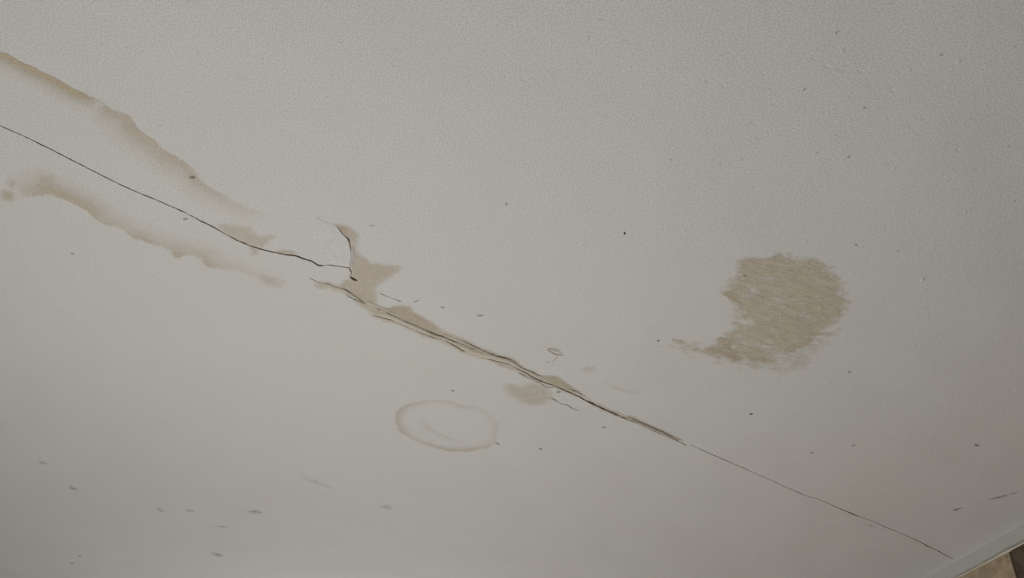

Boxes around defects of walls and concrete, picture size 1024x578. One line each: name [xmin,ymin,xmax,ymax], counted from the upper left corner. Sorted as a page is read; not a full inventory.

damp [0,52,89,98]
crack [0,125,953,559]
damp [719,256,846,362]